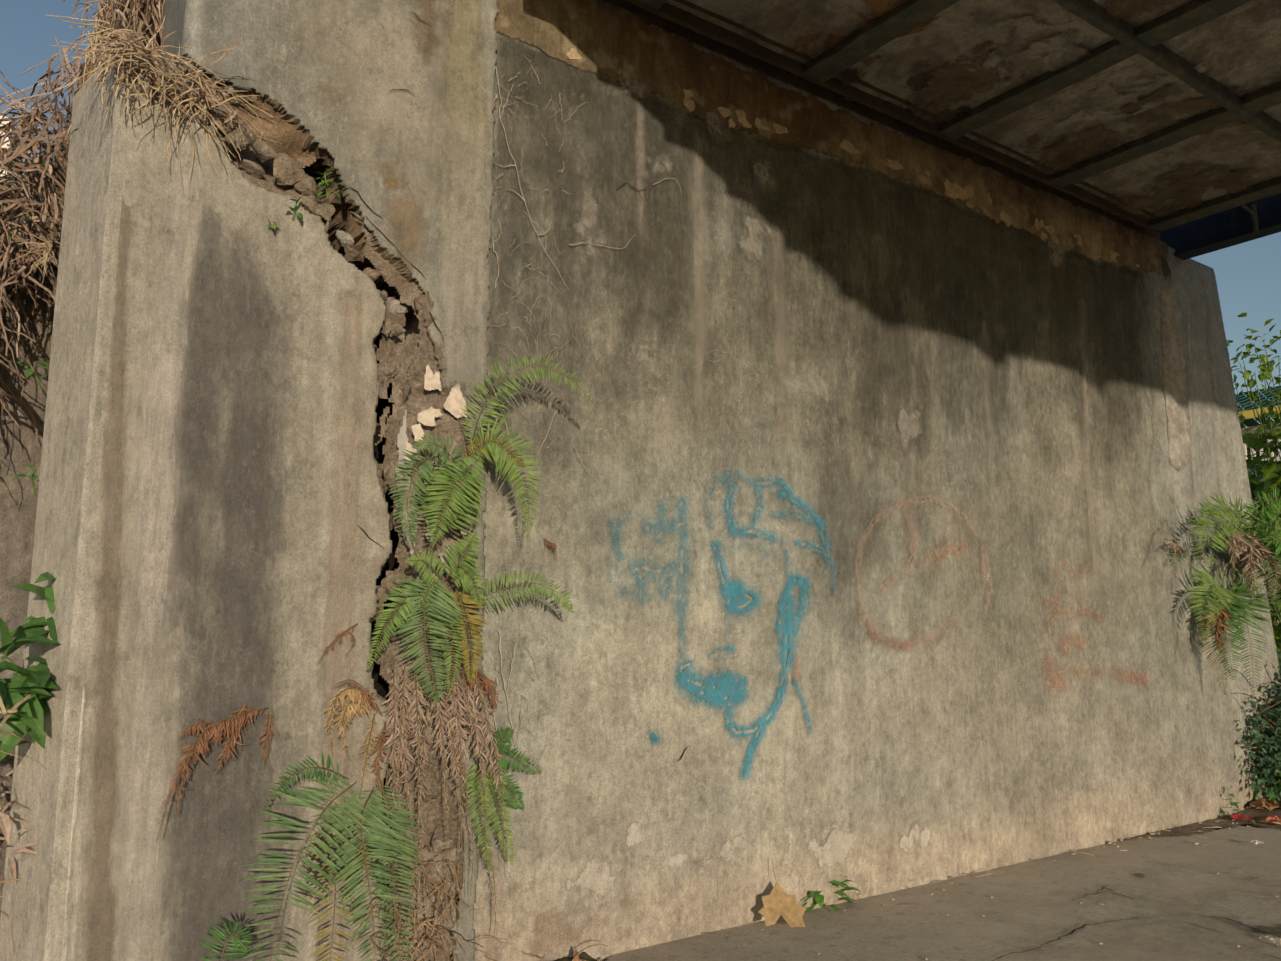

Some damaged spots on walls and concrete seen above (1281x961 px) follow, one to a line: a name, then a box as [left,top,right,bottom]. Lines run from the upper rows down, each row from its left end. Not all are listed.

leakage [117,134,280,961]
crack [174,56,444,724]
leakage [317,294,361,961]
crack [382,763,391,886]
leakage [502,41,1141,444]
flaking render [495,0,1171,275]
leakage [1055,71,1181,127]
crack [992,885,1275,961]